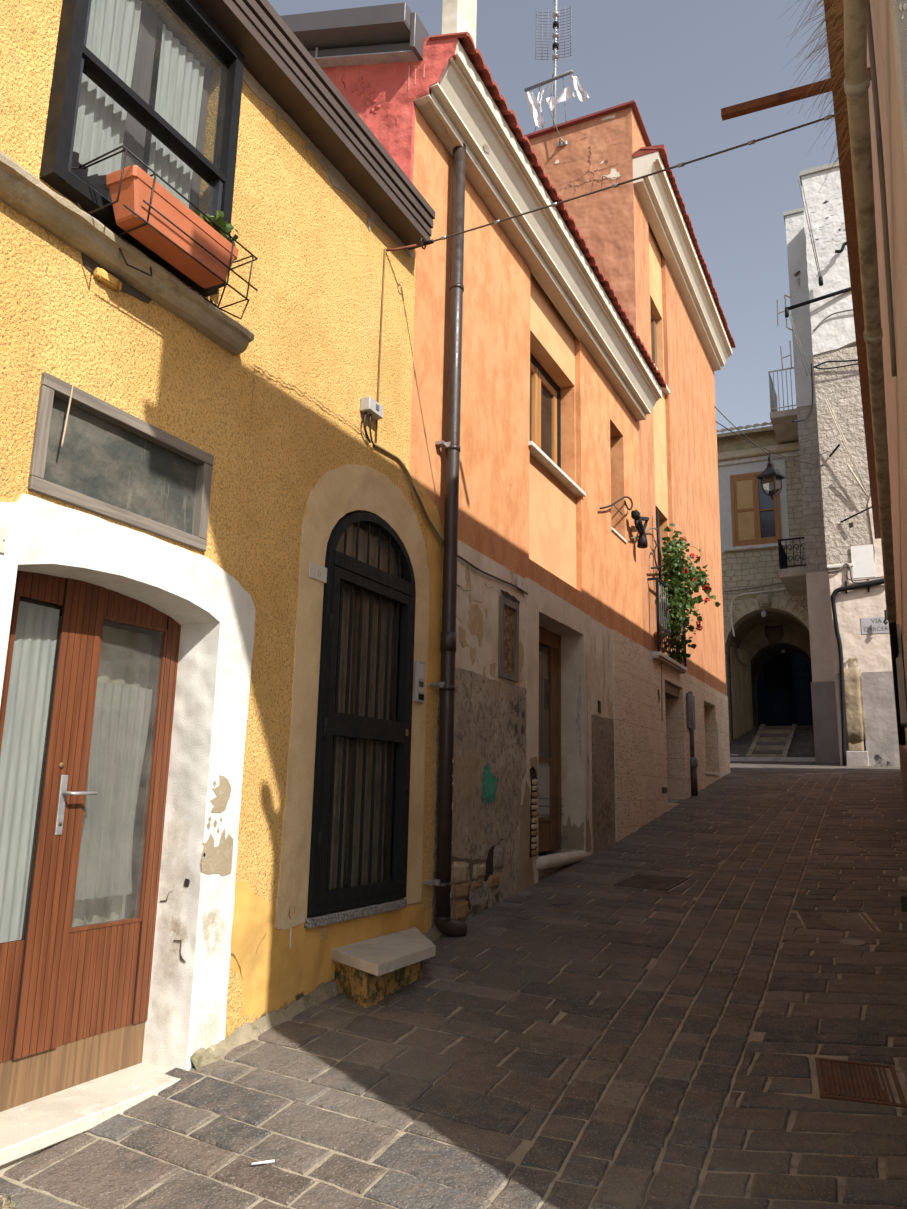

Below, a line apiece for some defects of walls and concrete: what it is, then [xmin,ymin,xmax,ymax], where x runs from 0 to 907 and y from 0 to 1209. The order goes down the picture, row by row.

crack [555,137,621,194]
peeling [160,775,233,902]